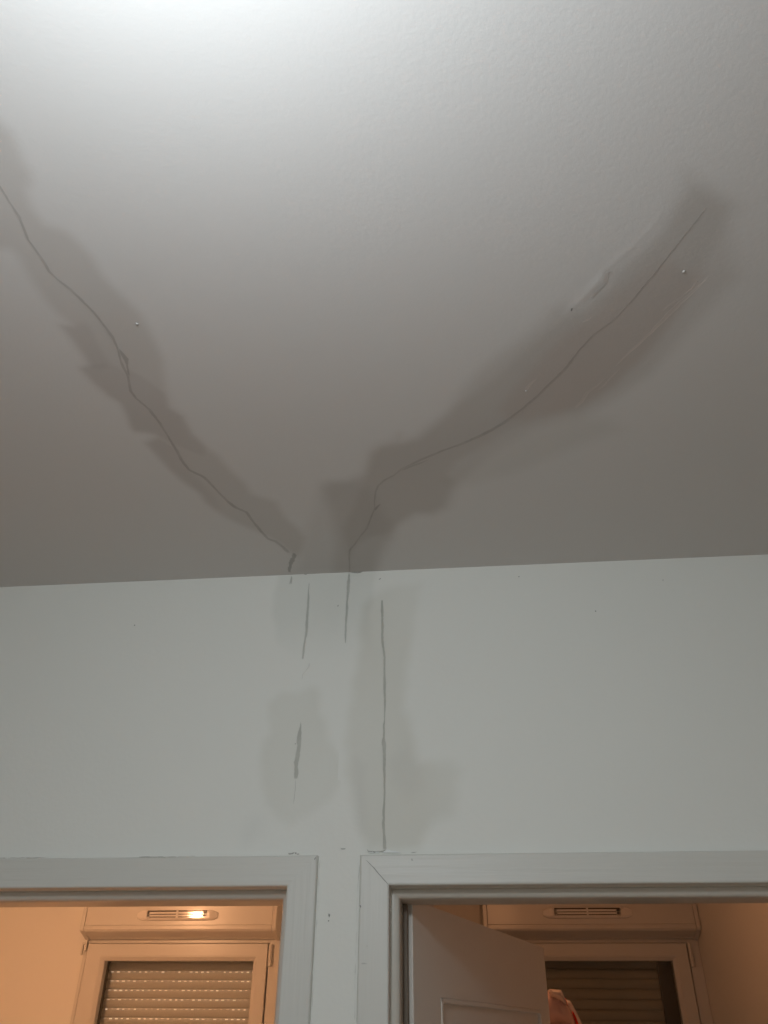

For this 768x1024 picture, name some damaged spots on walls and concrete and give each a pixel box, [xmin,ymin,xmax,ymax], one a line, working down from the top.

crack [0,186,310,659]
water stain [0,111,760,857]
crack [344,208,706,643]
crack [293,722,302,804]
crack [366,600,389,885]